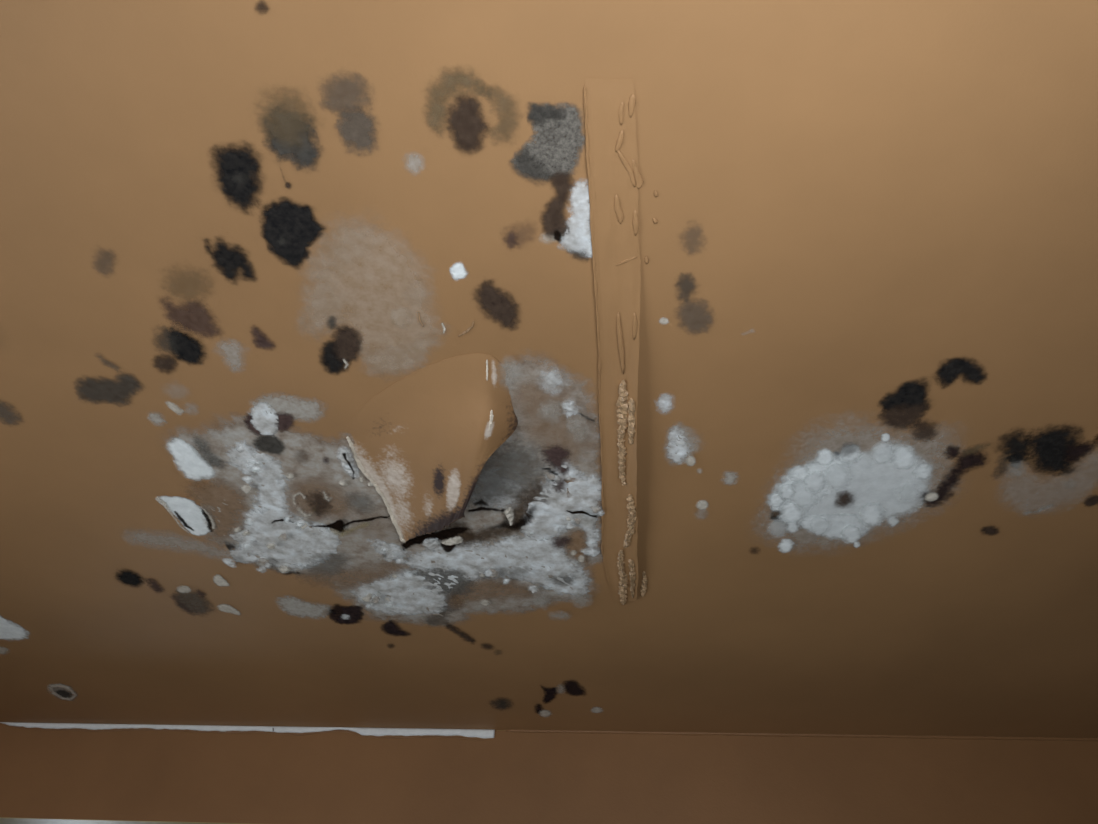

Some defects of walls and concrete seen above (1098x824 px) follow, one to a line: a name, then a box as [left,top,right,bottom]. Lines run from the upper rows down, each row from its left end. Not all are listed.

mould [213,147,324,267]
mould [511,103,585,240]
mould [205,239,254,280]
damp [154,302,218,373]
mould [321,317,361,374]
damp [769,358,986,552]
crack [272,516,389,534]
spalling [156,360,604,625]
crack [566,510,597,518]
spalling [616,380,648,605]
peeling [0,617,28,654]
peeling [0,722,495,741]